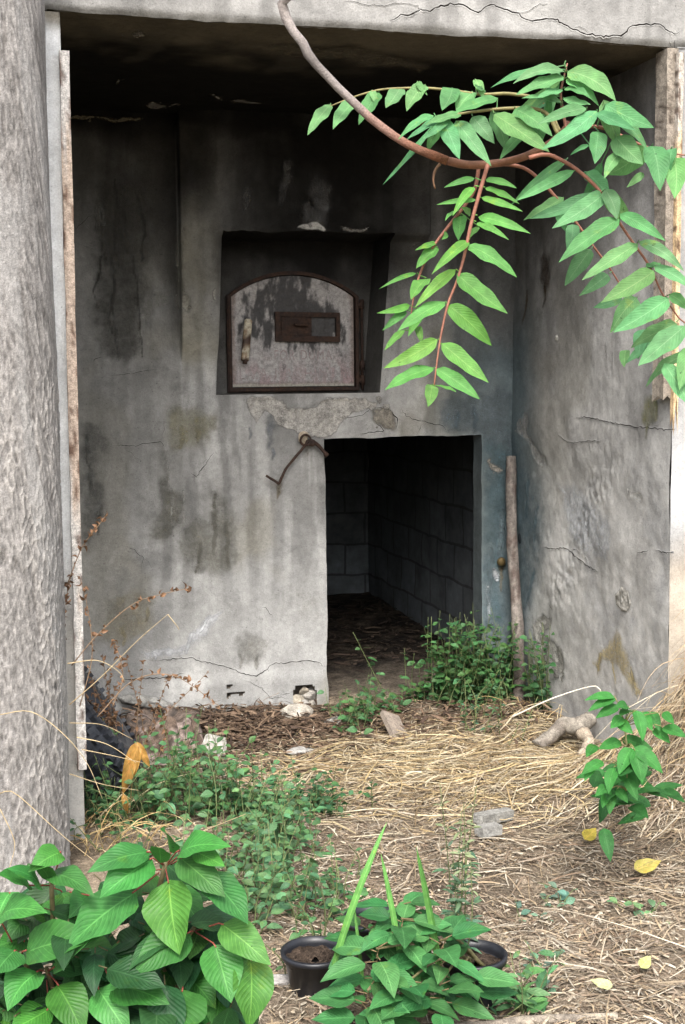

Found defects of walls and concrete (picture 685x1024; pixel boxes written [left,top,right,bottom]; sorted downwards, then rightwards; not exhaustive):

crack [345,0,679,43]
spalling [247,396,395,438]
crack [558,415,675,451]
damp [186,497,232,573]
crack [543,546,598,572]
crack [121,656,324,699]